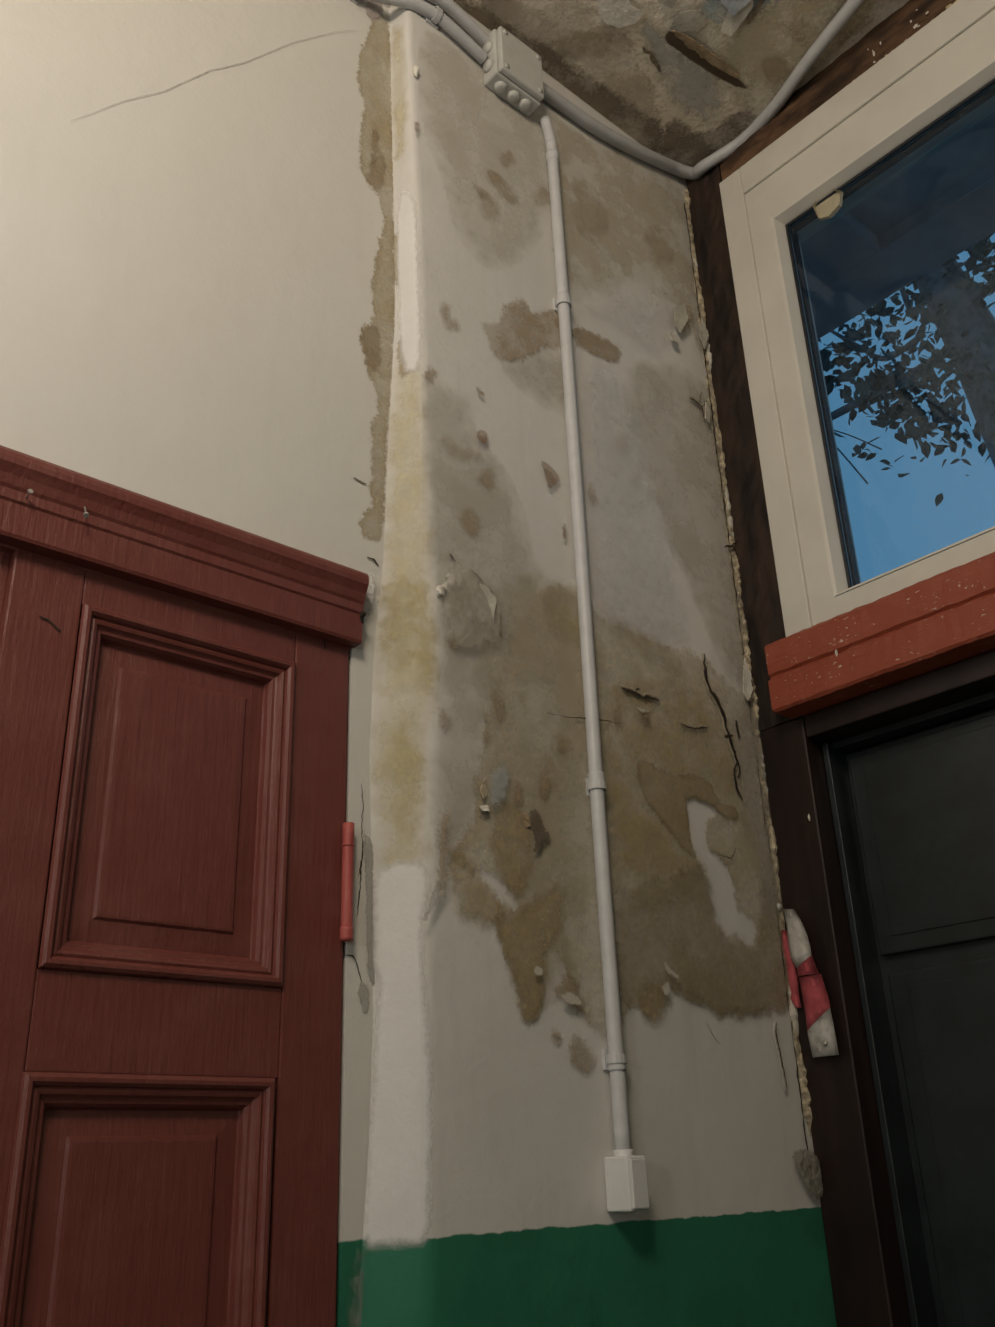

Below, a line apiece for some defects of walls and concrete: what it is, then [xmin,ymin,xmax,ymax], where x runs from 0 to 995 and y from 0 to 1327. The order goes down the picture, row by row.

crack [71,30,354,121]
flaking render [366,1,383,19]
peeling [597,0,643,28]
flaking render [657,0,747,88]
peeling [720,0,753,36]
damp [431,53,694,303]
damp [357,21,431,694]
damp [495,303,621,362]
damp [438,462,789,1024]
crack [550,653,743,801]
damp [377,723,421,866]
flaking render [520,809,550,852]